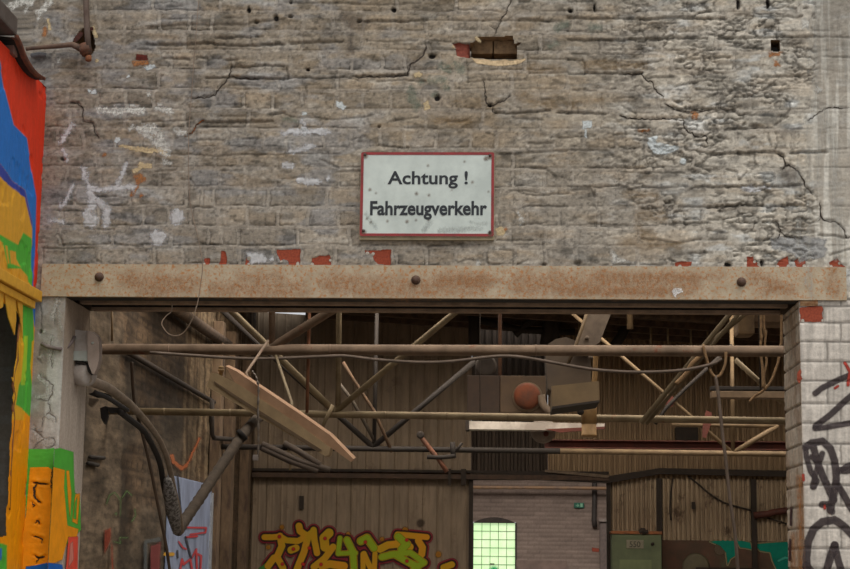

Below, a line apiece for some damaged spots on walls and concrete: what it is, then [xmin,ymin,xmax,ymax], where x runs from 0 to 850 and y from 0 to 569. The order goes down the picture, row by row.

crack [357,44,427,78]
spalling [452,36,526,66]
crack [192,67,258,99]
crack [483,81,510,114]
crack [620,73,708,144]
crack [778,154,847,238]
spalling [277,249,301,265]
spalling [365,249,391,265]
spalling [799,306,824,322]